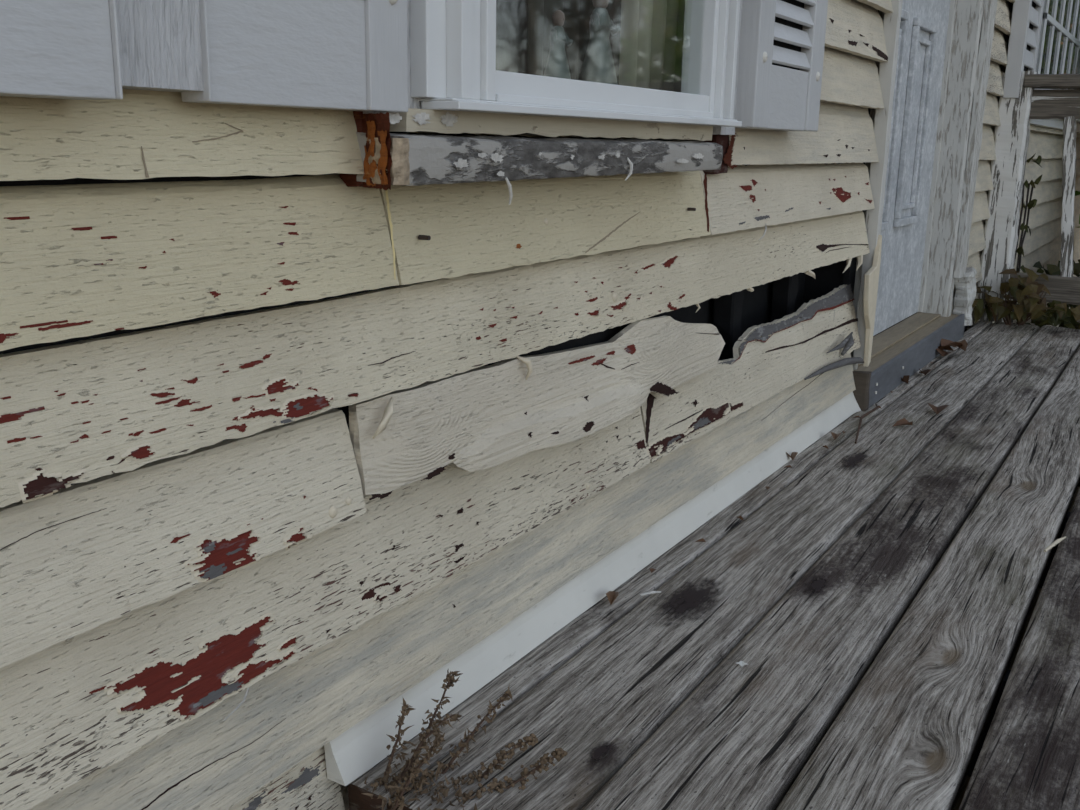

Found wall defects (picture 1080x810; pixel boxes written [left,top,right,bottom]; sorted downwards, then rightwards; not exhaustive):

peeling [388,112,458,127]
rust [362,112,392,190]
peeling [453,153,504,176]
peeling [635,254,678,273]
peeling [575,281,662,317]
peeling [568,344,636,366]
peeling [89,613,297,723]